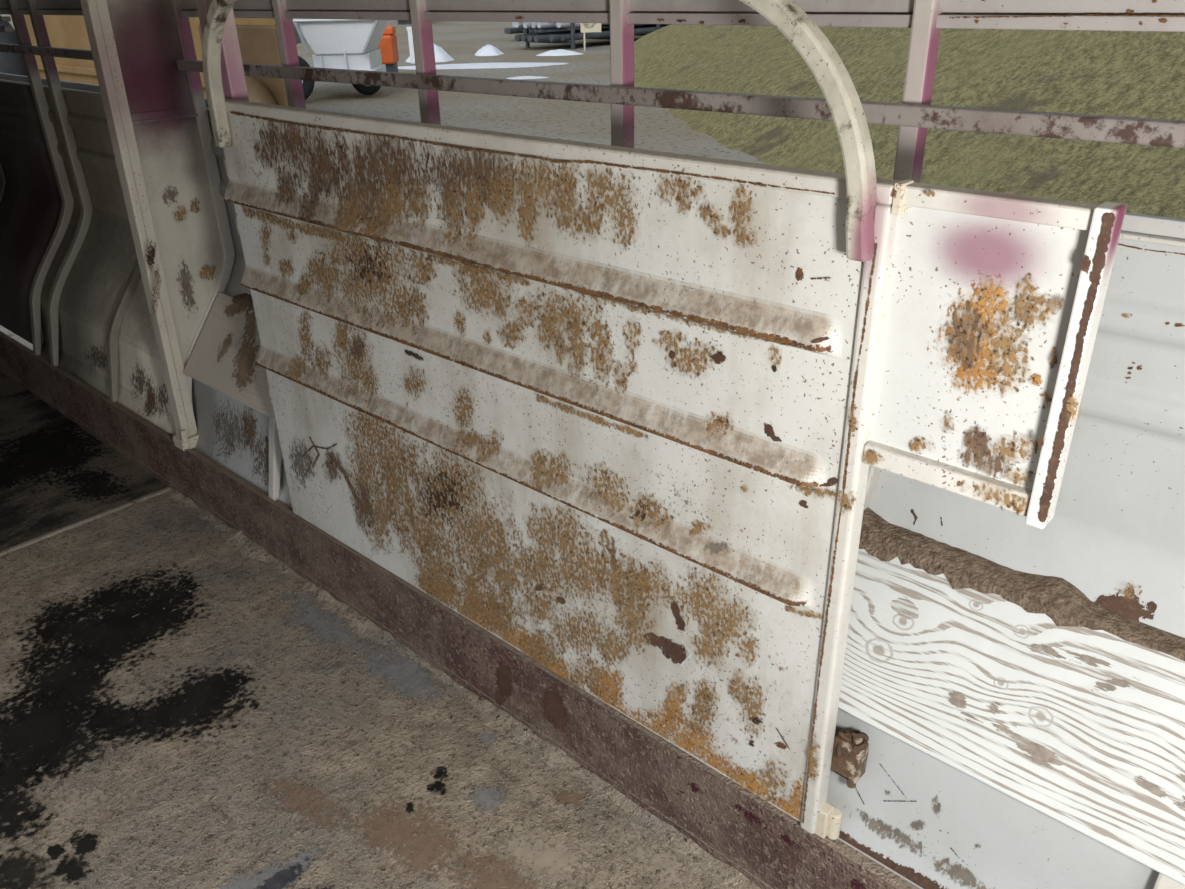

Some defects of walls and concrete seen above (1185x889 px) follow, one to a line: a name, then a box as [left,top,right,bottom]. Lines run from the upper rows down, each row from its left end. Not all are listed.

corrosion [950,0,1185,25]
corrosion [162,187,200,222]
corrosion [146,237,162,319]
corrosion [928,273,1064,409]
damp [0,416,134,502]
corrosion [224,111,877,823]
corrosion [864,450,885,465]
corrosion [909,437,936,452]
corrosion [944,411,1038,516]
peeling [1093,583,1157,621]
damp [0,564,261,889]